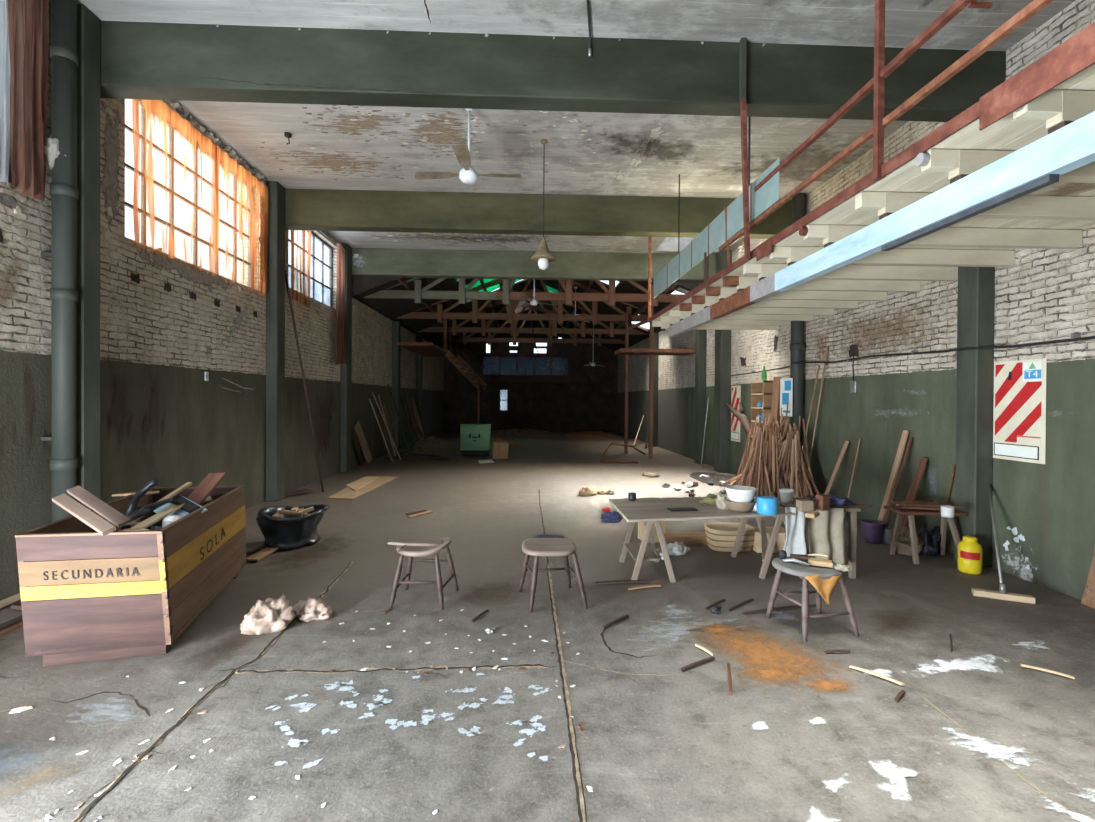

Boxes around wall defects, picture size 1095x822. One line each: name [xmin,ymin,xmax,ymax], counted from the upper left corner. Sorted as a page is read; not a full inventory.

crack [423,0,432,24]
peeling [164,100,490,182]
damp [611,114,693,184]
damp [727,135,848,182]
crack [1,490,662,822]